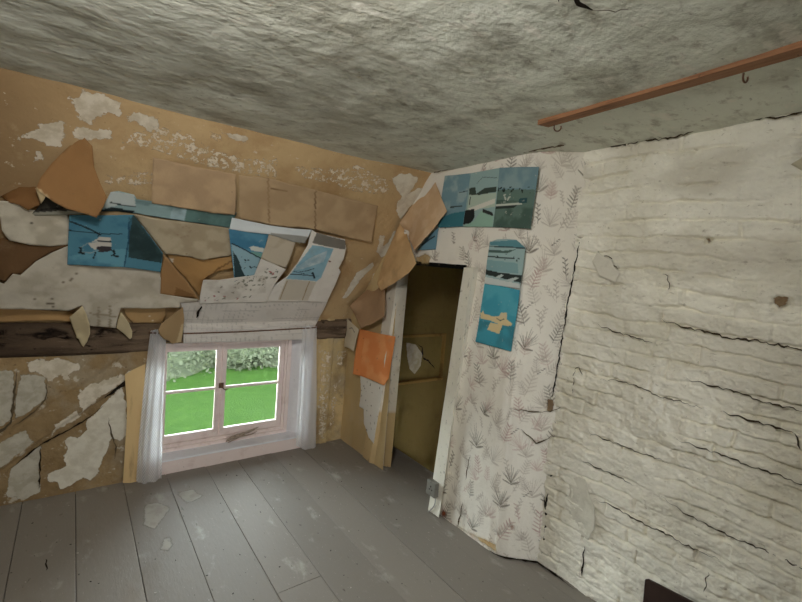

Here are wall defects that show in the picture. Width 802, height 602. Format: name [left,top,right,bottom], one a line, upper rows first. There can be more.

crack [558,0,628,12]
peeling [18,89,277,178]
crack [610,131,693,147]
crack [754,111,802,120]
peeling [342,263,375,299]
crack [509,242,582,413]
crack [662,319,802,351]
flaking render [406,343,422,374]
flaking render [0,358,80,426]
crack [608,379,700,408]
crack [688,379,802,449]
flaking render [0,371,130,499]